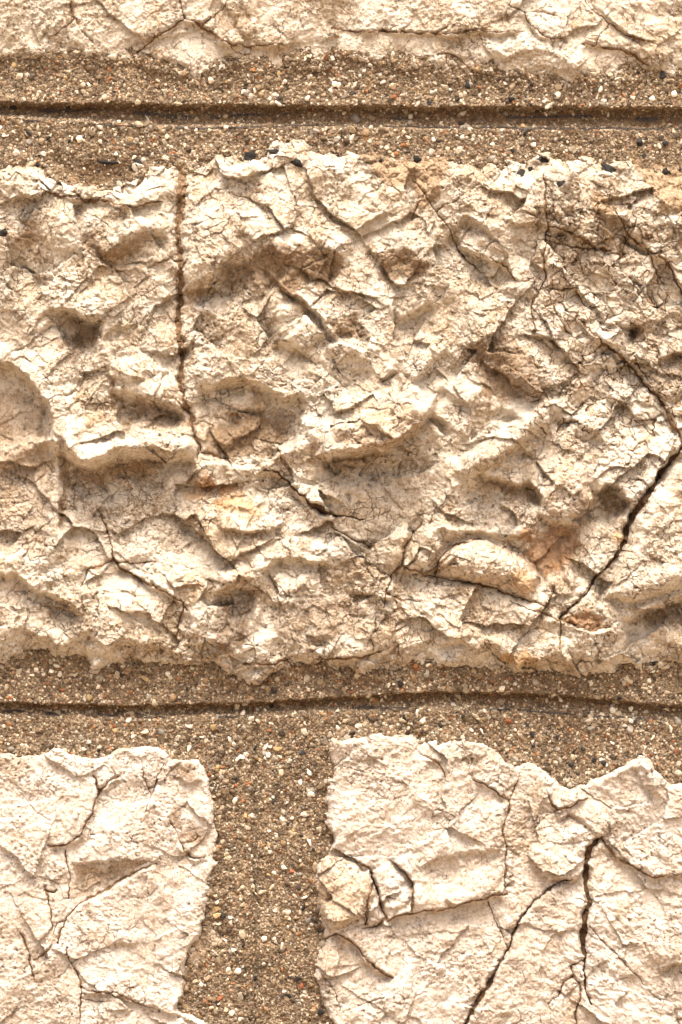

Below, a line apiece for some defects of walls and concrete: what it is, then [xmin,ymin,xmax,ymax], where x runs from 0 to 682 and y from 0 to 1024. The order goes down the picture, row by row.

crack [36,162,231,459]
crack [242,173,682,736]
crack [19,764,205,1024]
crack [321,780,682,1024]